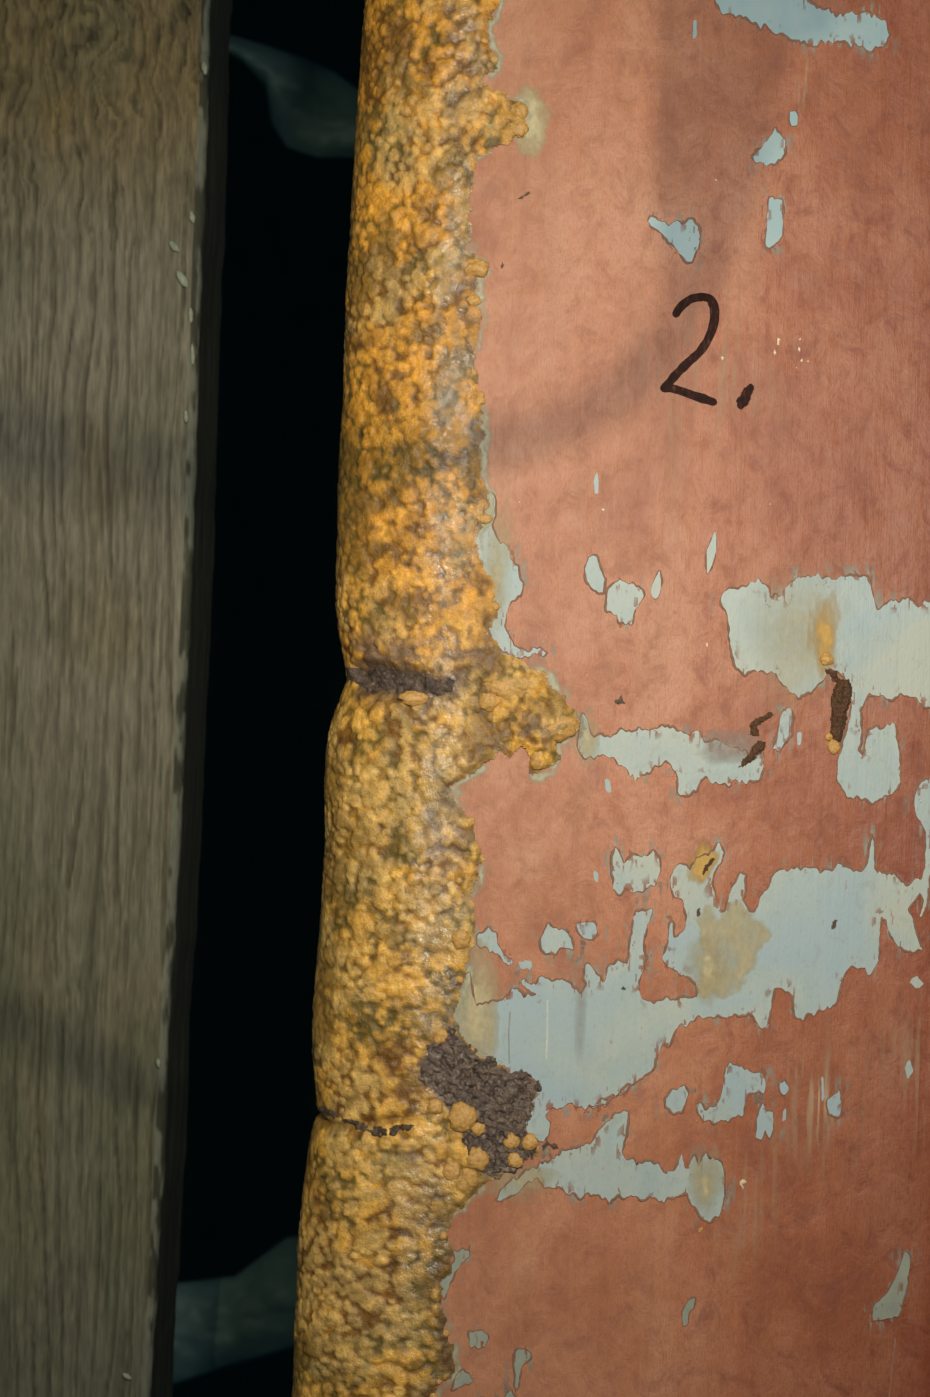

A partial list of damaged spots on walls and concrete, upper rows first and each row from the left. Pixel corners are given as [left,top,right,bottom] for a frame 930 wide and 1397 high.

peeling [488,0,504,78]
peeling [714,0,891,56]
peeling [647,212,703,264]
peeling [473,410,560,692]
peeling [705,531,717,574]
peeling [583,554,663,628]
rust [815,612,834,669]
rust [292,0,596,1397]
peeling [451,569,930,1233]
peeling [870,1250,912,1327]
peeling [437,1327,490,1397]
peeling [504,1346,533,1397]